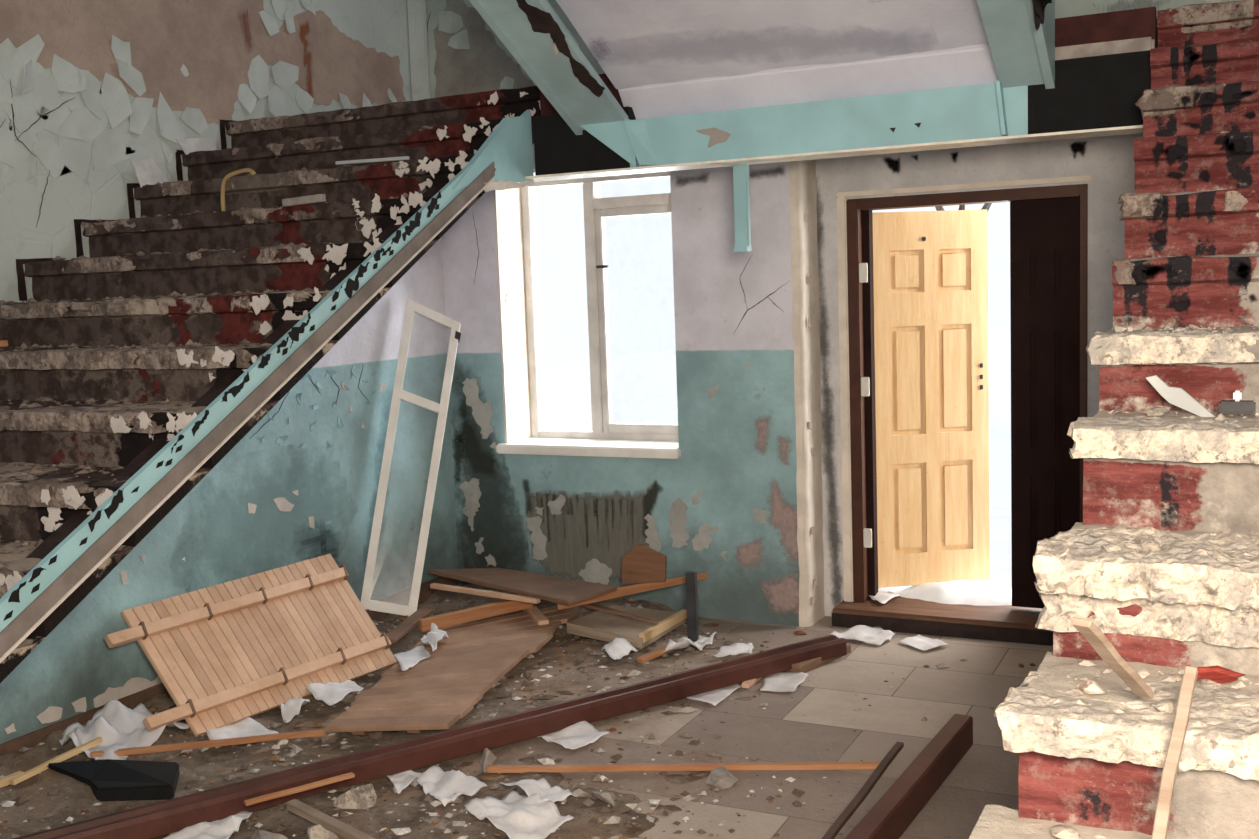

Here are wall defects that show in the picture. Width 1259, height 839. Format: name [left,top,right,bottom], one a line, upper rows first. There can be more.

peeling [516,0,605,97]
spalling [1135,83,1227,118]
crack [0,79,74,227]
peeling [0,0,540,402]
crack [733,255,788,335]
spalling [1086,324,1259,365]
spalling [0,406,209,468]
peeling [462,378,499,455]
spalling [0,476,139,546]
peeling [0,555,57,621]
spalling [1032,525,1259,648]
spalling [994,669,1259,781]